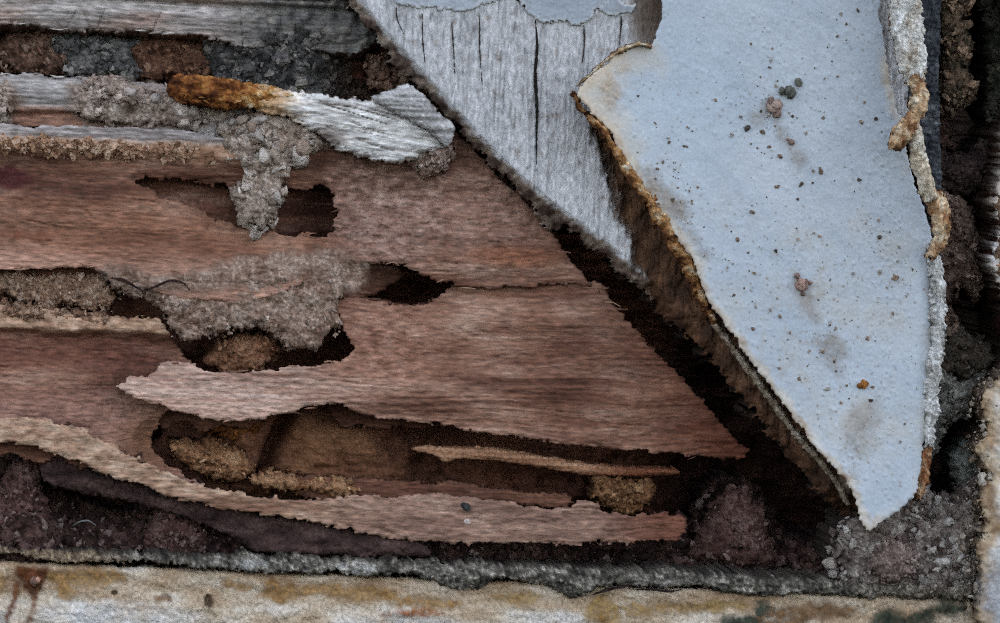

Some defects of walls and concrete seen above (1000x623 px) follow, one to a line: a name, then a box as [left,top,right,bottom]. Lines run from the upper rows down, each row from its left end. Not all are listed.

peeling [372,83,455,148]
crack [517,0,539,170]
peeling [570,0,951,532]
flaking render [978,191,1000,343]